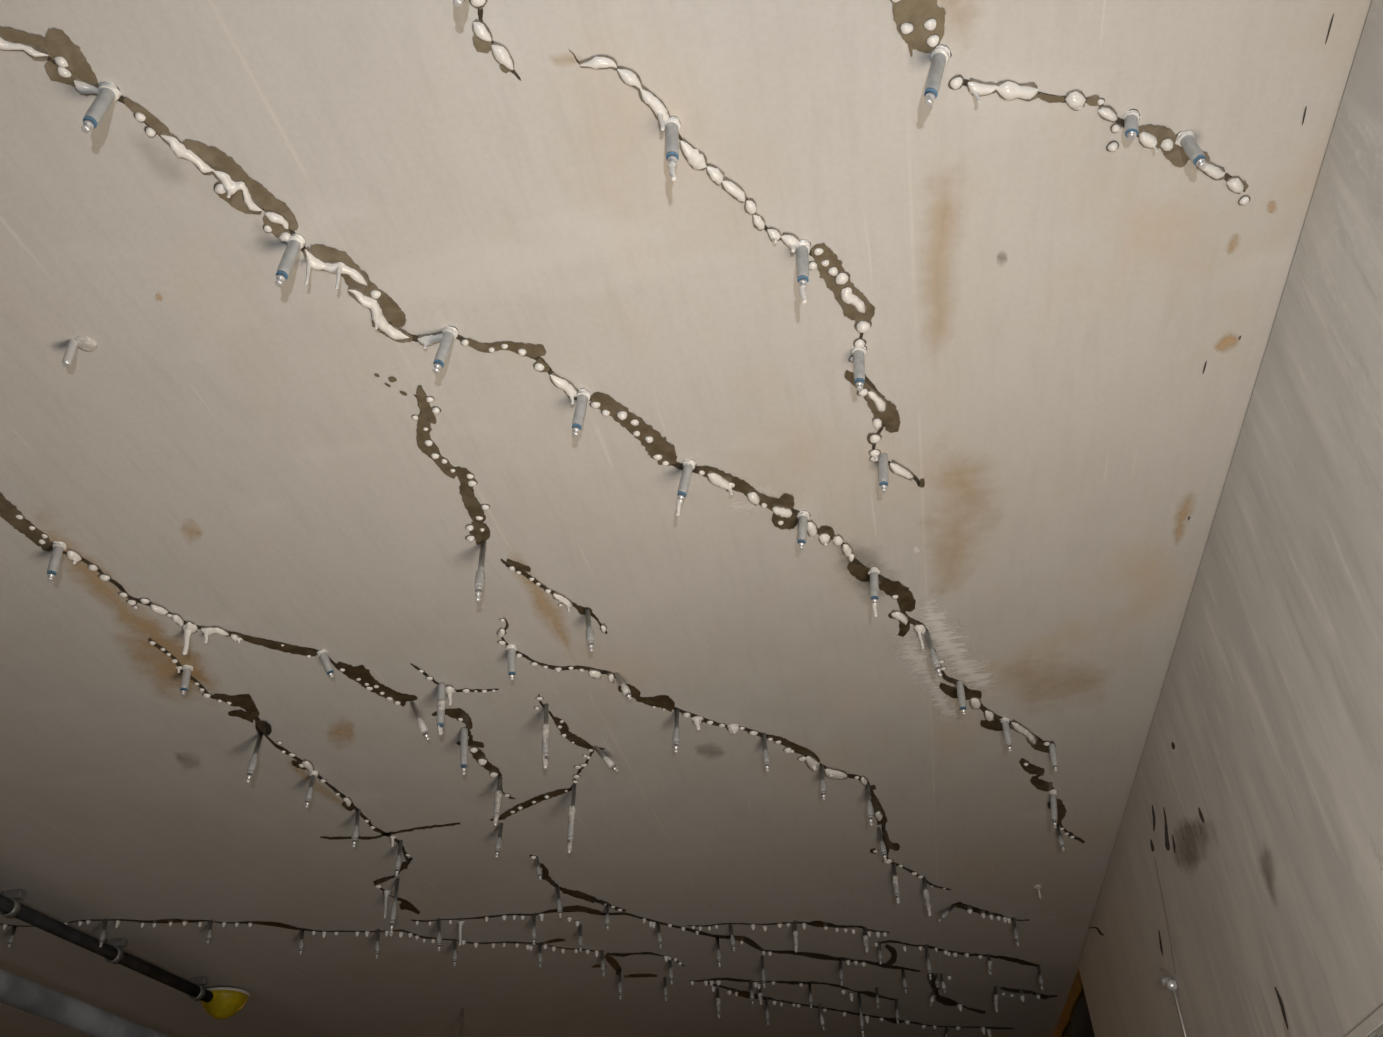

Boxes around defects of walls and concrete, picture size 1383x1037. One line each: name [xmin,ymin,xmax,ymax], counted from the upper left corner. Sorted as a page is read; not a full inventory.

crack [469,0,521,81]
crack [890,0,946,57]
crack [948,75,1251,205]
crack [0,26,1085,843]
damp [895,600,997,716]
crack [0,493,1057,1037]